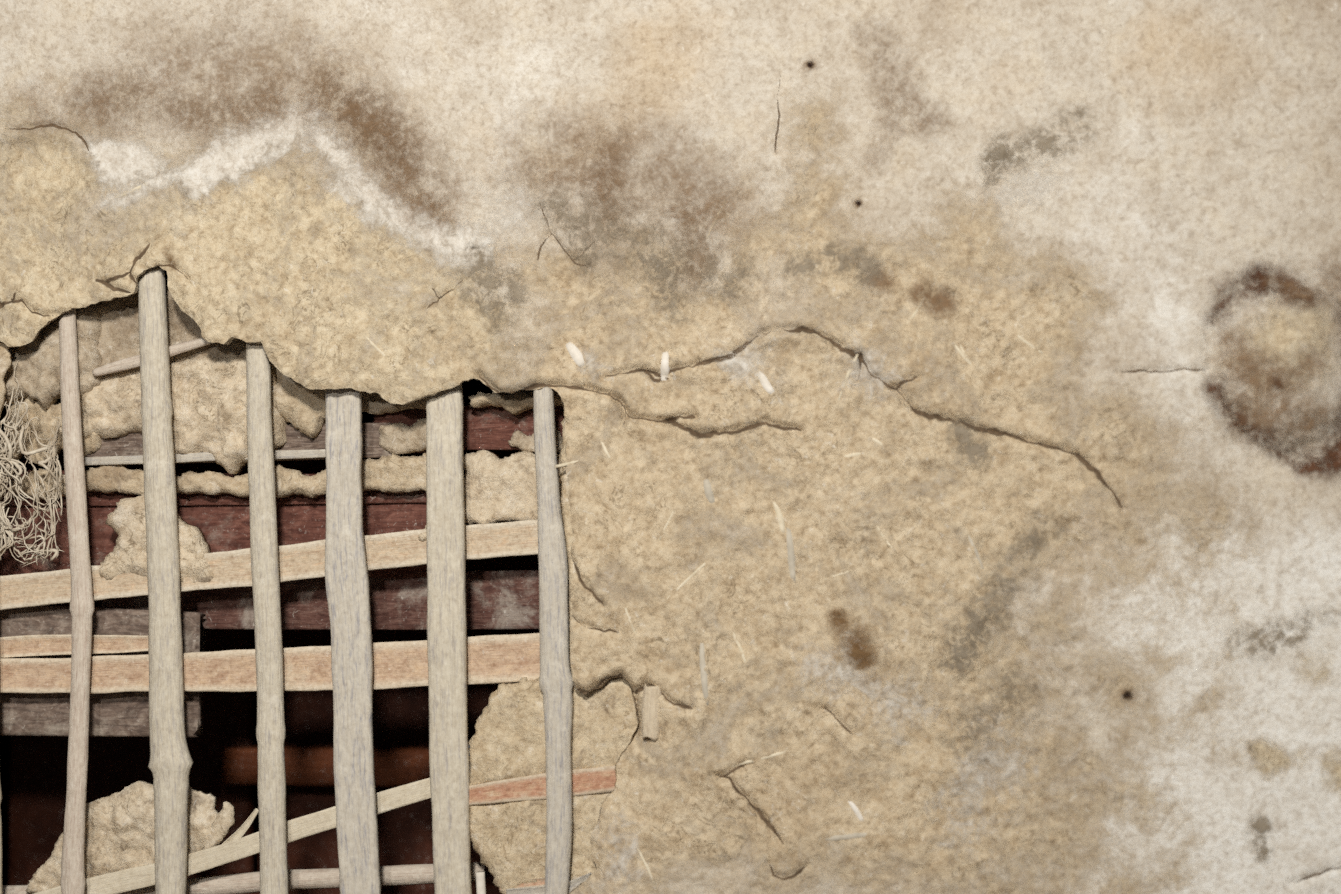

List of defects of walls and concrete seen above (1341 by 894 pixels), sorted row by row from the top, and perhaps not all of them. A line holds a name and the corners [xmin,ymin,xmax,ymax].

peeling [0,97,532,405]
leakage [465,246,525,320]
leakage [539,152,751,320]
leakage [785,244,891,289]
crack [480,326,1123,509]
peeling [511,160,1229,894]